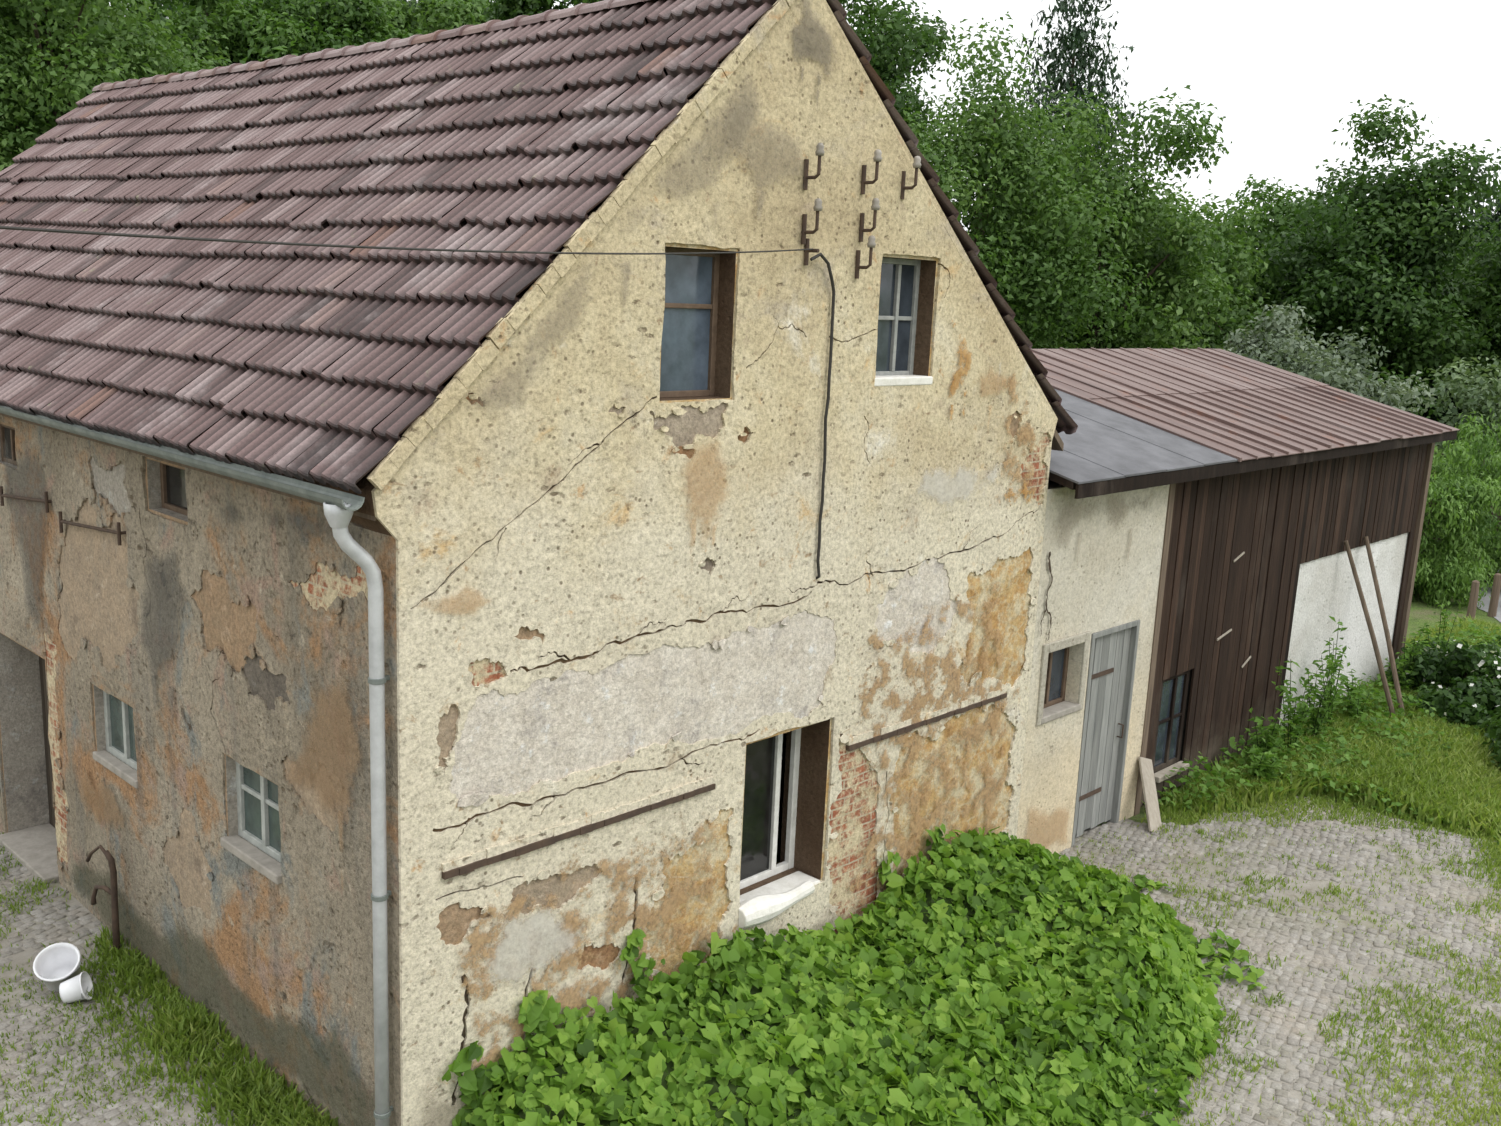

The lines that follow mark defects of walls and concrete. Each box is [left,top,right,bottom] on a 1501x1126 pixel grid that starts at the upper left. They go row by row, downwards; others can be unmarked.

crack [425,396,656,598]
spalling [650,402,727,459]
flaking render [44,457,140,870]
crack [510,535,1001,672]
spalling [874,547,1037,687]
crack [1040,552,1053,641]
spalling [433,704,459,772]
crack [433,729,759,832]
spalling [825,704,1015,935]
spalling [436,902,490,945]
spalling [511,864,602,914]
spalling [643,808,732,977]